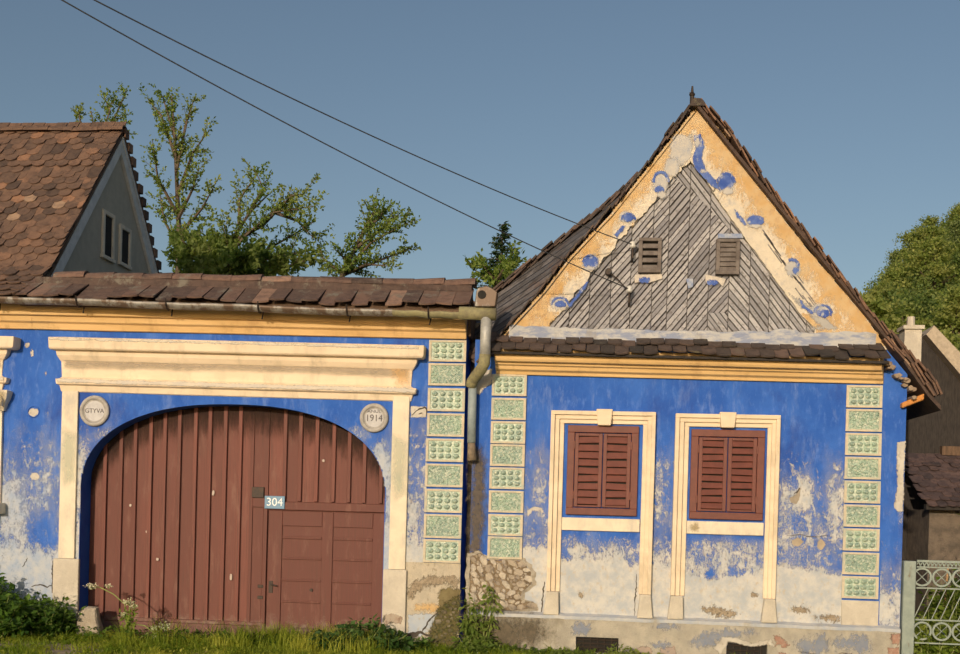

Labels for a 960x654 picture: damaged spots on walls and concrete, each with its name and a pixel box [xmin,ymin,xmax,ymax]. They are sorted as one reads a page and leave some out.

flaking render [411,406,427,418]
peeling [0,444,60,608]
flaking render [383,430,461,642]
peeling [522,451,549,612]
peeling [559,459,873,654]